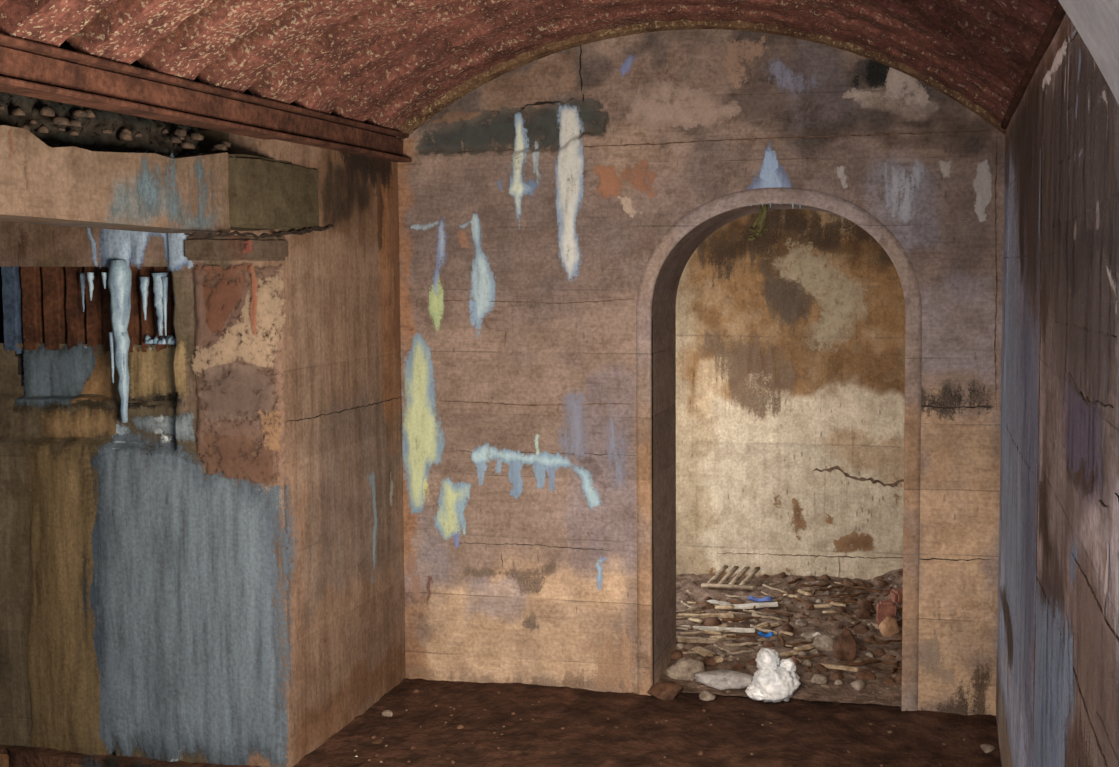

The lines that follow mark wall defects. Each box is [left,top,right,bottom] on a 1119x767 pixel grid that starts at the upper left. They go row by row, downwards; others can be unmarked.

crack [491,45,584,114]
spalling [0,92,231,157]
leakage [873,158,952,224]
crack [426,297,628,305]
leakage [697,209,895,331]
leakage [145,333,176,345]
flaking render [187,263,287,485]
crack [446,399,635,407]
leakage [696,330,808,421]
leakage [918,25,1119,767]
crack [583,130,1119,767]
crack [465,542,611,566]